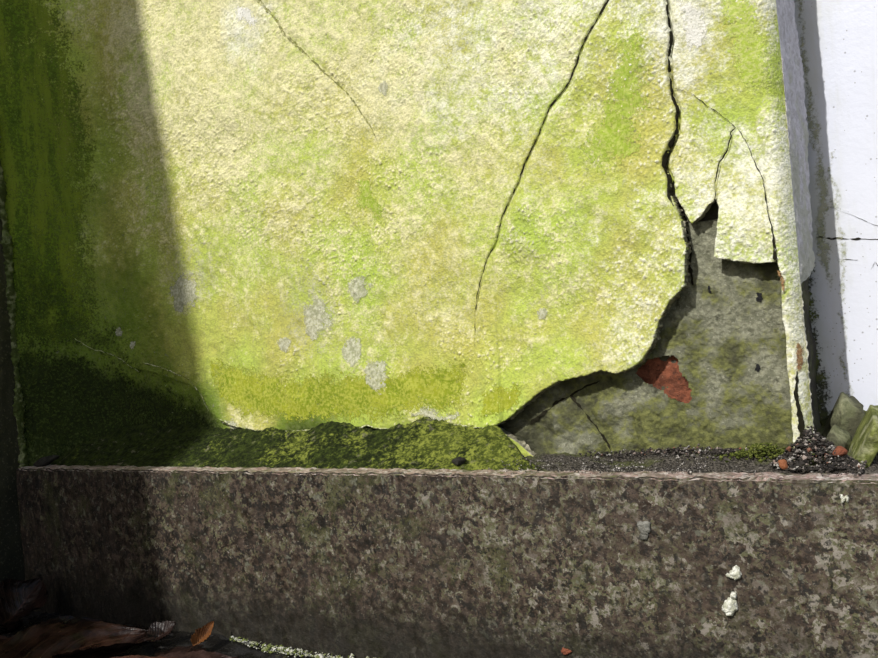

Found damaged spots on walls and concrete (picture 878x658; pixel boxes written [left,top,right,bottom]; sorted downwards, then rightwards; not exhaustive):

crack [474,0,609,347]
spalling [498,219,794,455]
crack [685,229,693,285]
crack [662,0,778,260]
crack [818,209,878,260]